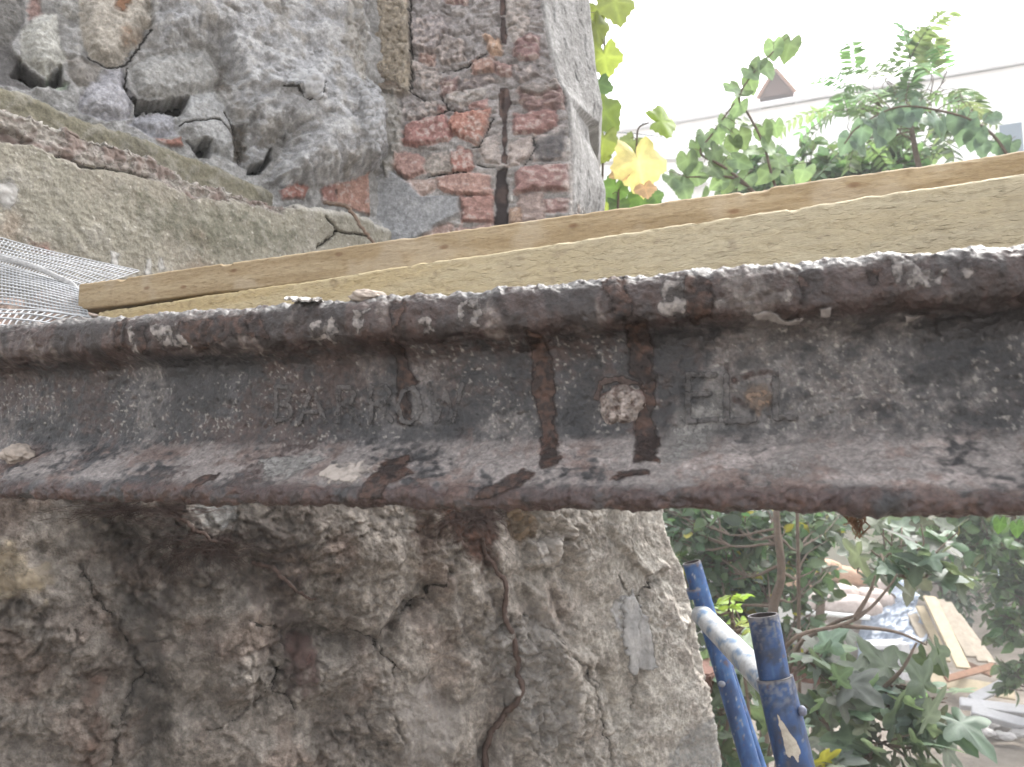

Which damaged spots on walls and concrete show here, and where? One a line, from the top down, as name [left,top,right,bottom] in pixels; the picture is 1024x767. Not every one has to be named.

crack [87,29,153,111]
crack [179,112,234,138]
crack [56,157,129,174]
crack [316,217,367,248]
corrosion [683,274,715,326]
corrosion [112,317,148,353]
corrosion [178,314,270,350]
corrosion [381,298,420,425]
corrosion [593,276,660,481]
corrosion [412,330,562,567]
corrosion [180,472,221,503]
corrosion [358,454,413,499]